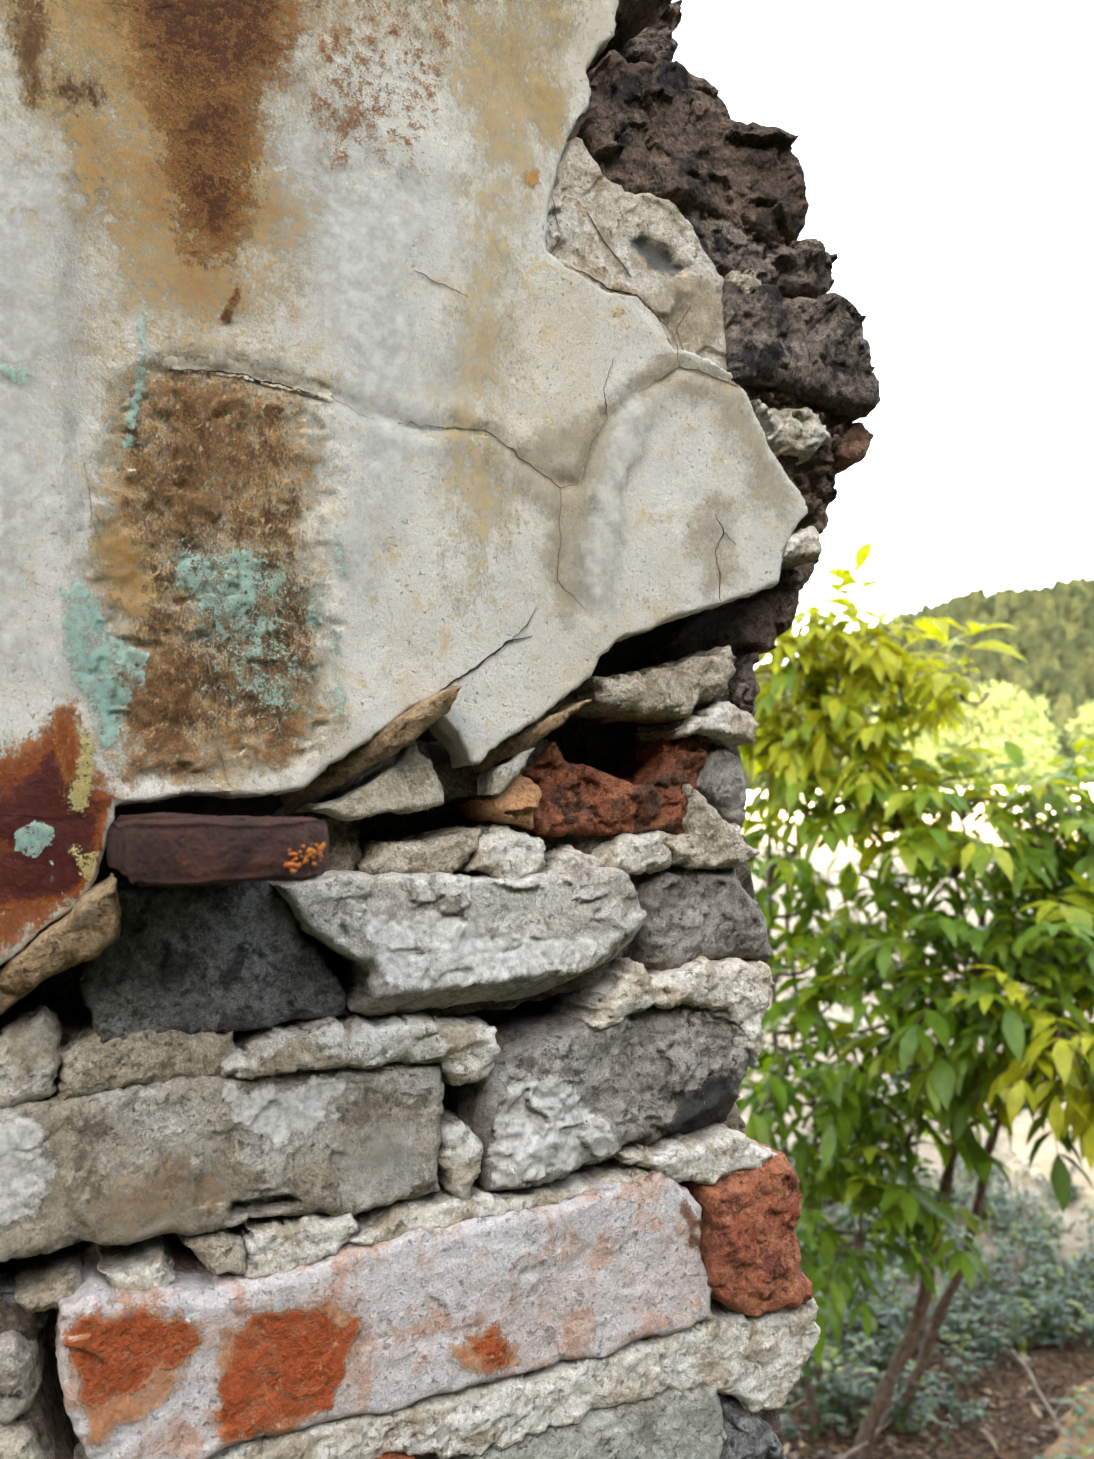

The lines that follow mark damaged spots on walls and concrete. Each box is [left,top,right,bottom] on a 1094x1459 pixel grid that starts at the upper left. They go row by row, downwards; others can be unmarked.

corrosion [0,0,581,386]
crack [413,270,468,297]
crack [334,290,737,692]
corrosion [0,701,118,956]
corrosion [284,842,325,874]